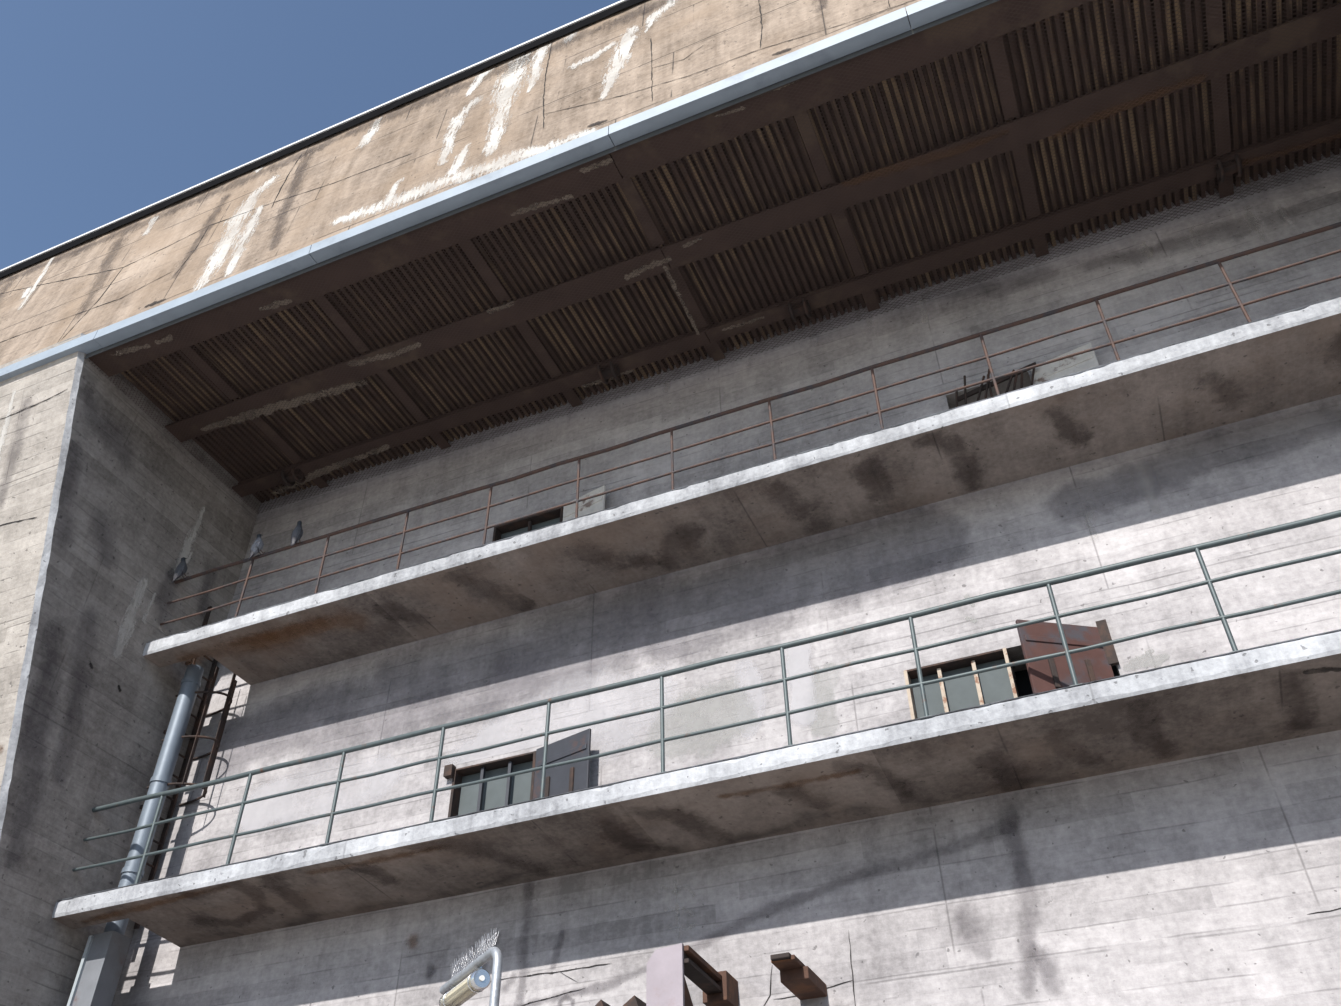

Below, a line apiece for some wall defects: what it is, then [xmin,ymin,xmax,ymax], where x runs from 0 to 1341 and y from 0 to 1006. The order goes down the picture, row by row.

damp [333,32,597,225]
damp [21,257,54,307]
damp [194,167,276,290]